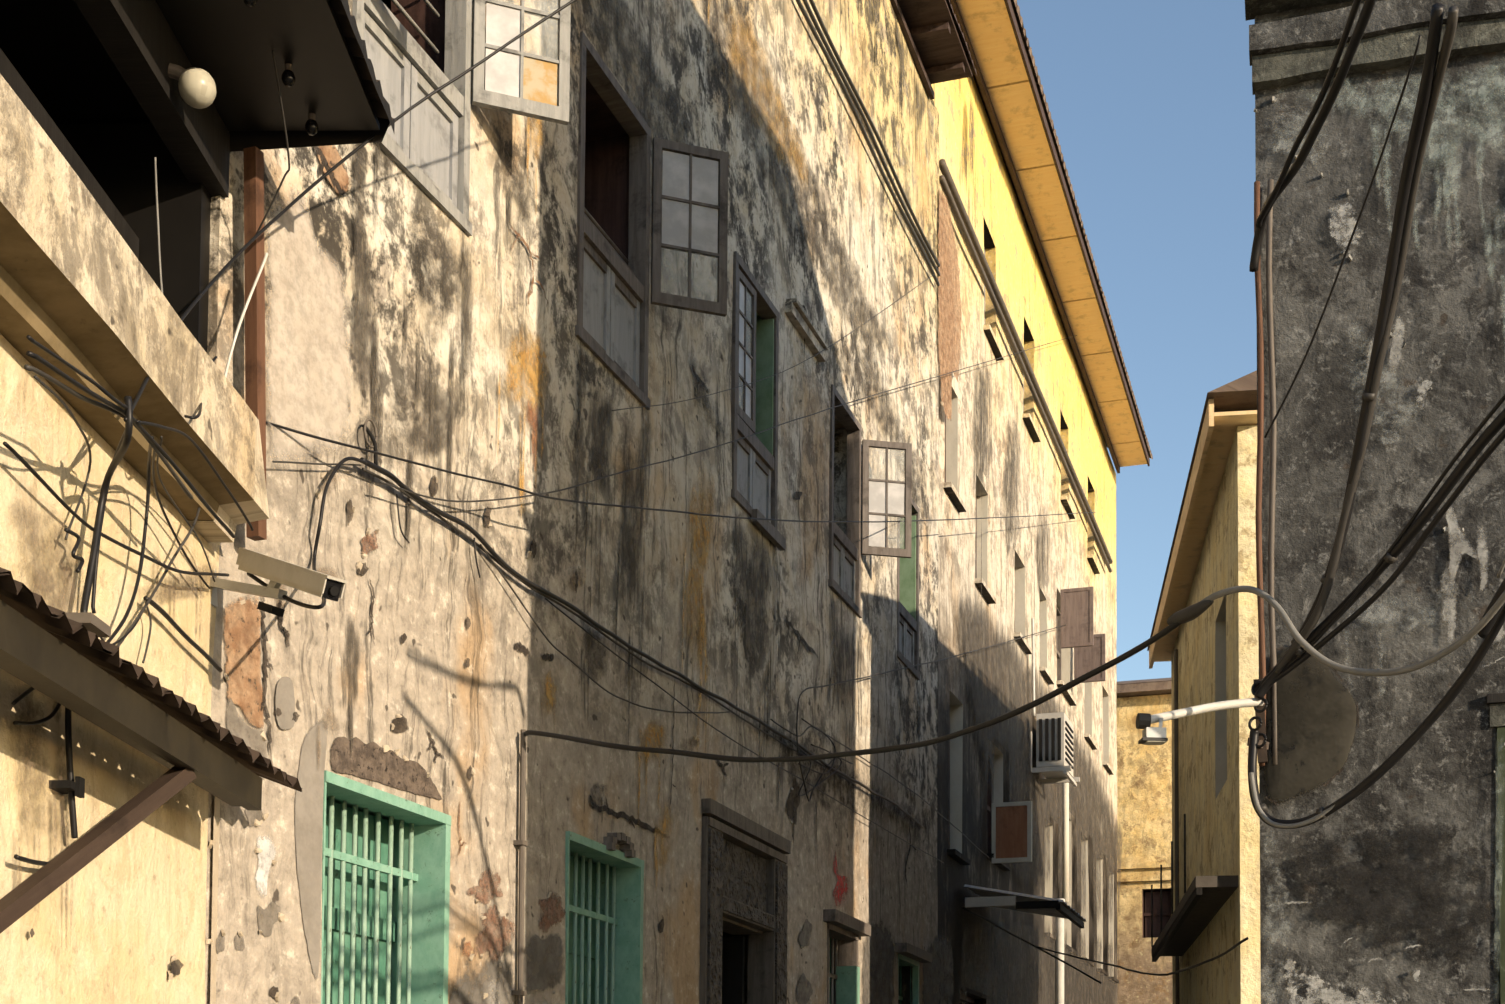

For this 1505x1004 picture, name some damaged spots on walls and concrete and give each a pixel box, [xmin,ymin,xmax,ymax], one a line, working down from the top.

spalling [318,145,352,193]
leakage [574,0,692,145]
leakage [705,0,925,508]
spalling [937,189,962,421]
leakage [1340,78,1421,207]
leakage [1428,65,1505,328]
corrosion [498,340,547,496]
spalling [223,596,300,758]
spalling [330,714,442,800]
leakage [735,518,926,843]
peeling [206,797,285,1004]
spalling [464,868,516,968]